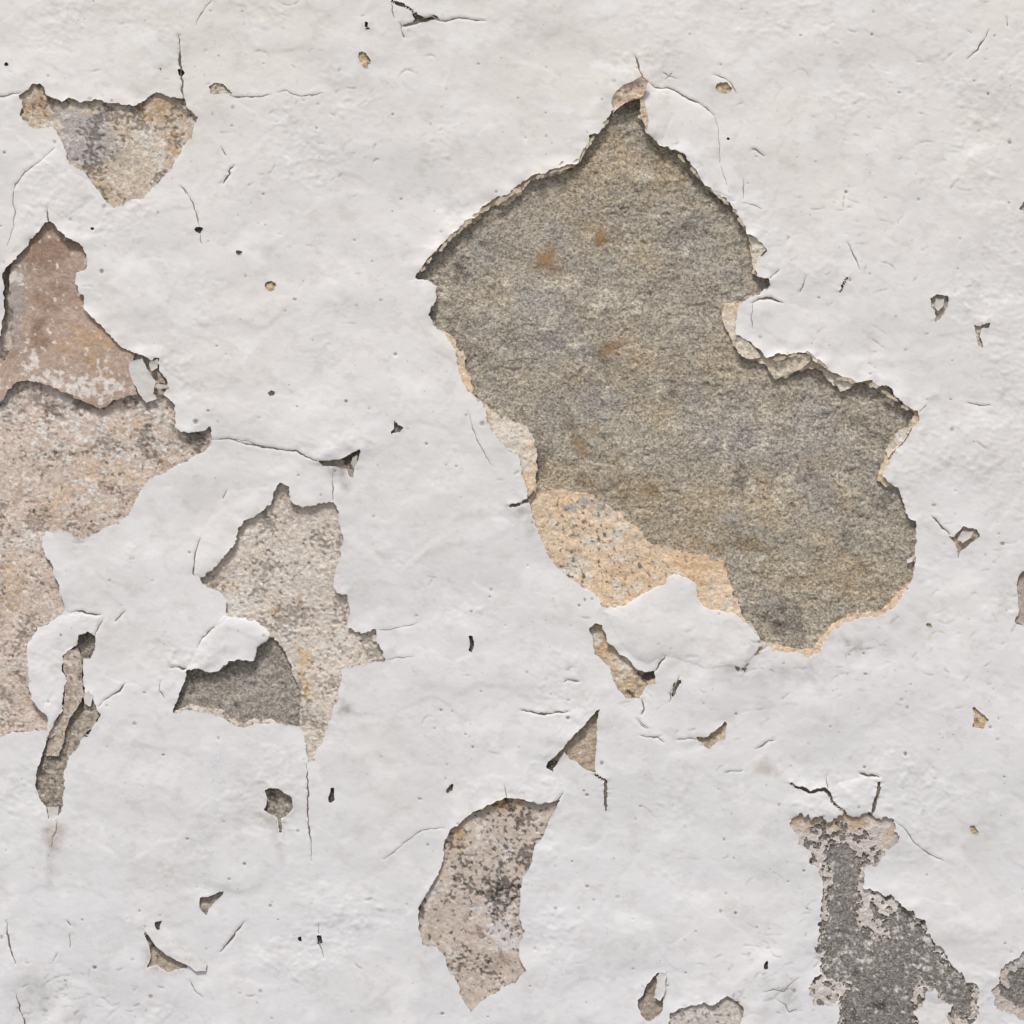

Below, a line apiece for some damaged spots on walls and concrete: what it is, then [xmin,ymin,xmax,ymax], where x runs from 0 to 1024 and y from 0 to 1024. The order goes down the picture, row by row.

crack [391,0,485,37]
peeling [19,83,197,208]
peeling [415,76,919,671]
peeling [0,221,212,820]
crack [212,438,334,501]
peeling [173,483,385,762]
peeling [589,623,656,699]
peeling [546,710,599,772]
crack [791,773,944,861]
peeling [418,797,560,1012]
peeling [790,810,1024,1024]
peeling [638,972,744,1024]